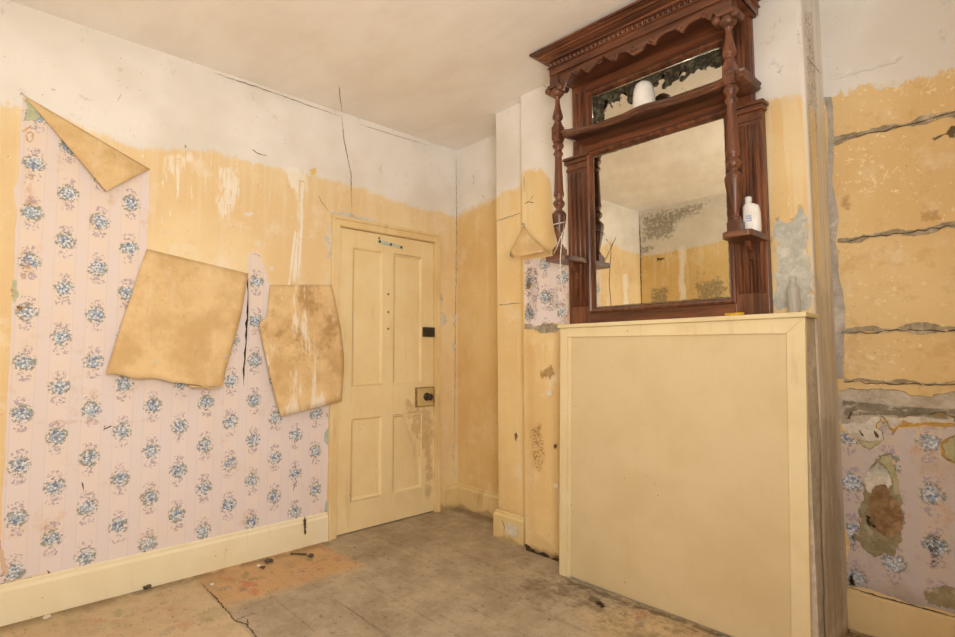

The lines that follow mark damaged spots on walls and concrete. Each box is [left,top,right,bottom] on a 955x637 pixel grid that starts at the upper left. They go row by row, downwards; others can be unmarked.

crack [215,73,426,212]
spalling [770,97,955,425]
spalling [853,448,906,557]